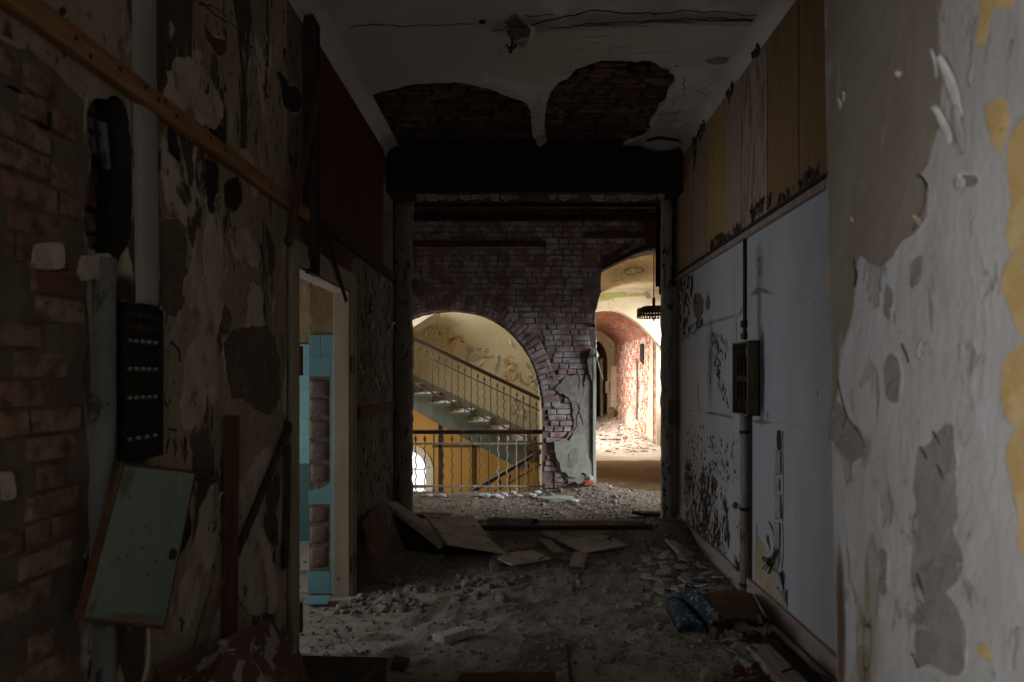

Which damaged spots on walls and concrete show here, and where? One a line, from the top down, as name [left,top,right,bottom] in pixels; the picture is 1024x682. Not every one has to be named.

crack [492,10,757,76]
peeling [976,0,1013,46]
flaking render [163,56,227,142]
spalling [373,58,676,147]
peeling [930,49,963,147]
flaking render [0,35,91,682]
flaking render [159,216,188,317]
flaking render [180,156,281,431]
spalling [883,343,909,403]
peeling [985,99,1024,556]
leakage [684,423,737,554]
spalling [910,422,992,678]